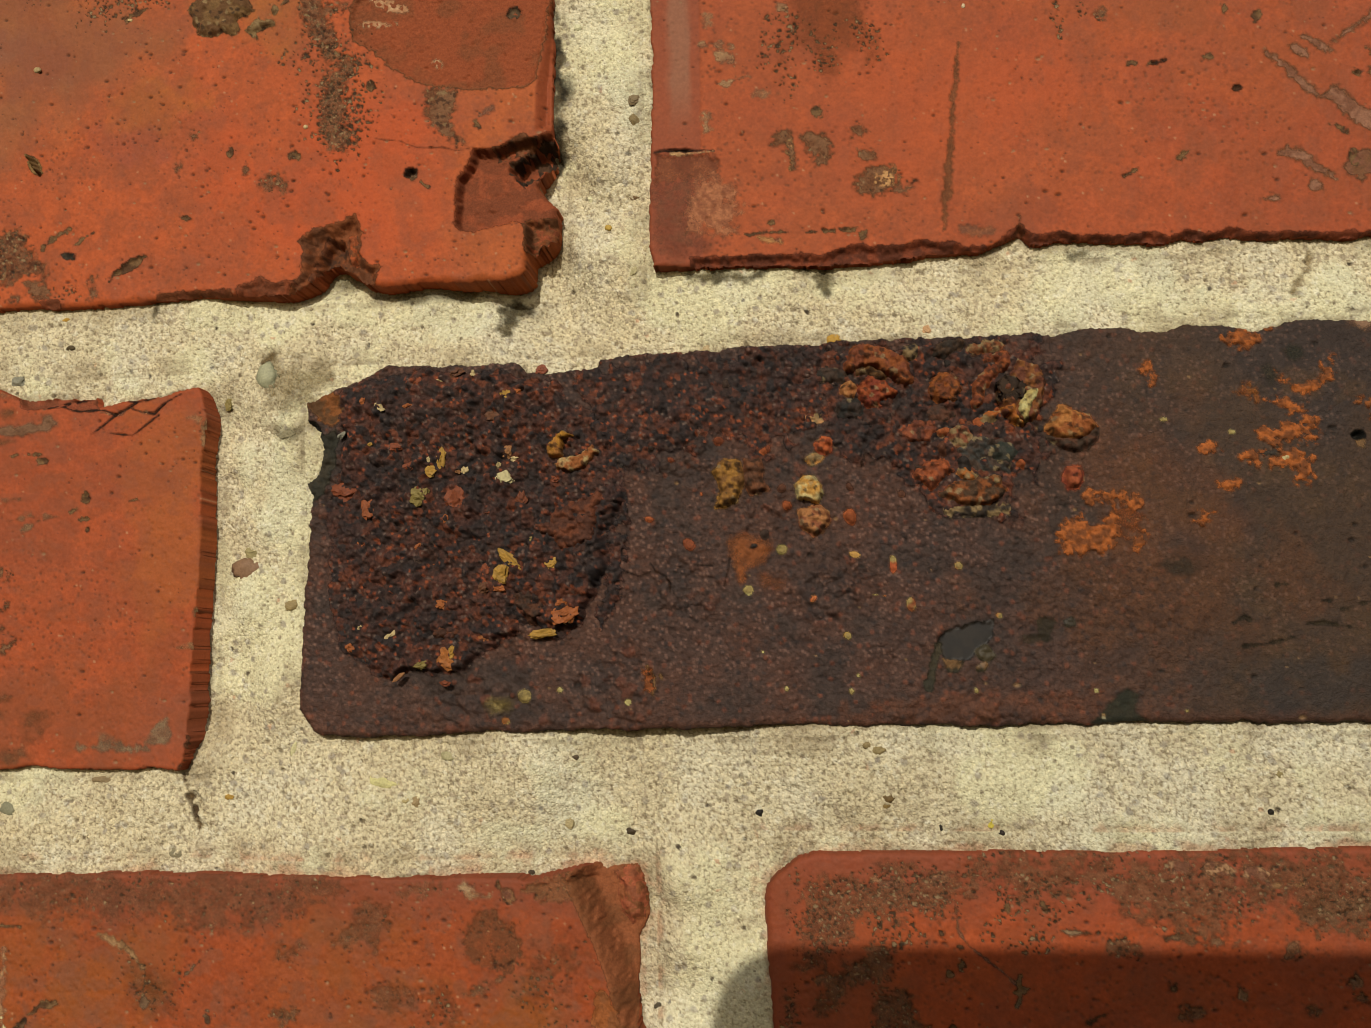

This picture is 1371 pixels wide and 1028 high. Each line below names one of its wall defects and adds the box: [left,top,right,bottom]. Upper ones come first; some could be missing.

spalling [245,0,560,258]
spalling [226,147,288,192]
spalling [653,154,1371,269]
crack [63,396,177,436]
spalling [307,392,385,520]
peeling [367,442,469,523]
peeling [495,445,528,504]
peeling [547,430,600,483]
peeling [482,533,521,592]
peeling [527,599,579,639]
peeling [392,645,455,687]
spalling [470,862,650,1028]